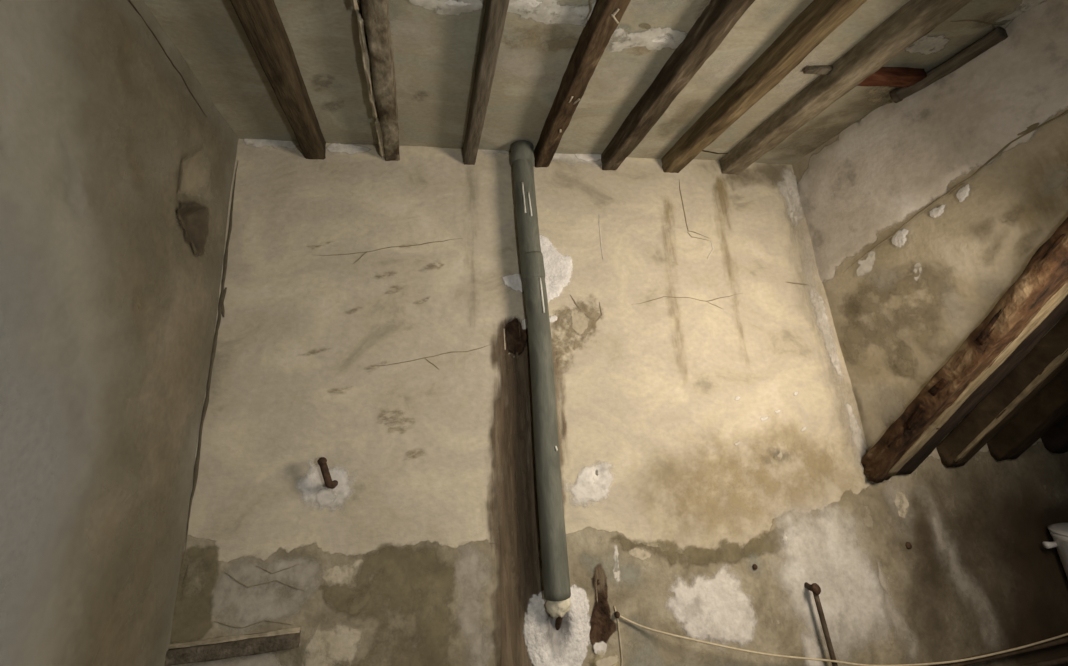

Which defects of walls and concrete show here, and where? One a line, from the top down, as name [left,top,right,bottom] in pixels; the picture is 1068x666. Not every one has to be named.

peeling [409,0,484,16]
peeling [507,0,596,51]
peeling [609,24,687,55]
peeling [929,205,945,218]
peeling [956,184,970,202]
peeling [891,228,908,248]
water stain [552,302,601,368]
rust [488,319,541,666]
water stain [612,527,789,565]
water stain [909,484,1068,666]
water stain [319,545,456,666]
water stain [803,635,823,666]